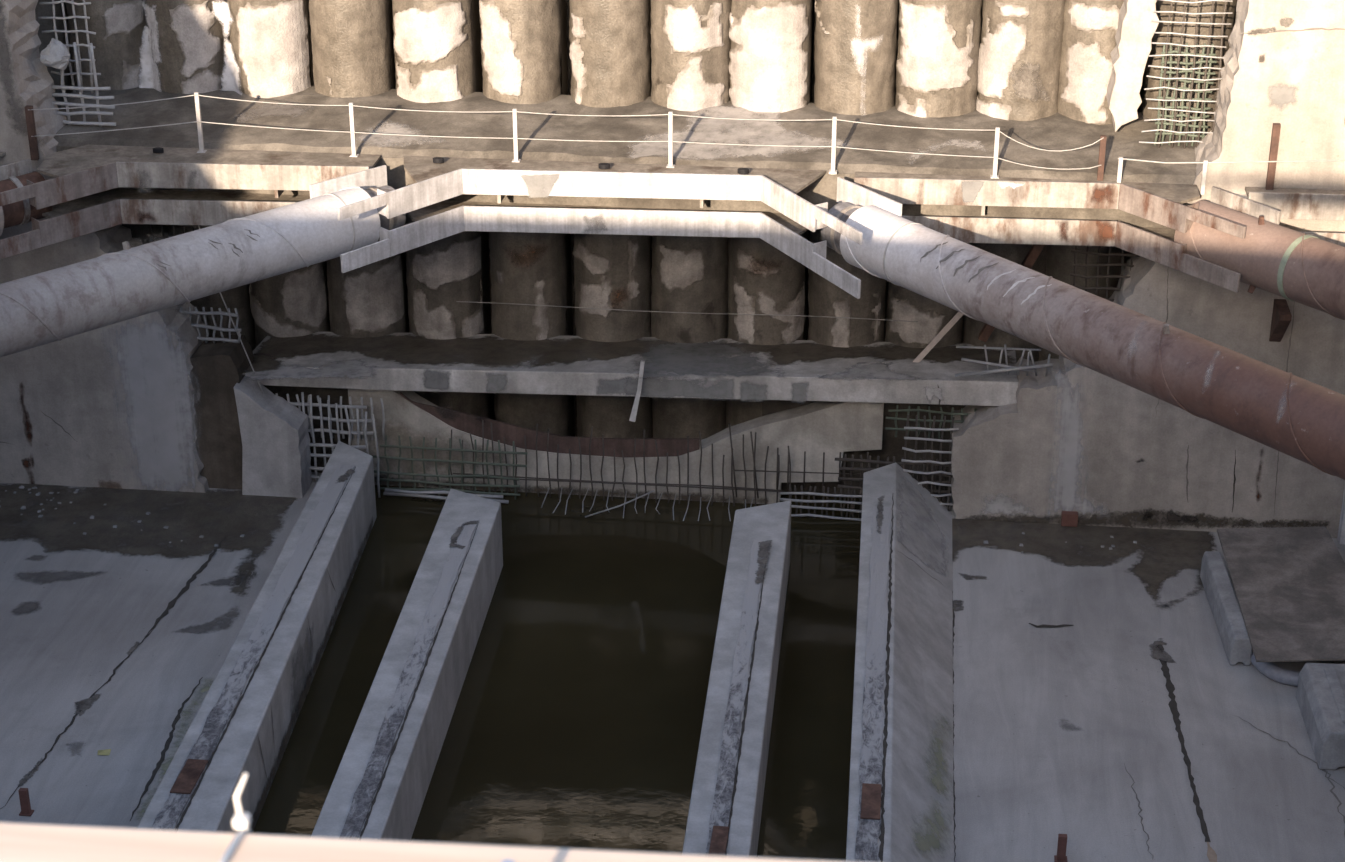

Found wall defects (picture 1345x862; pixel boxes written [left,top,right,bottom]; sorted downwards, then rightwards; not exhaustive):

peeling [38,0,144,127]
peeling [394,0,525,103]
peeling [569,13,587,104]
peeling [663,0,830,113]
spalling [1139,0,1233,149]
peeling [659,244,705,293]
spalling [276,392,977,534]
damp [12,602,38,614]
damp [18,555,101,584]
crack [0,536,227,821]
crack [1150,638,1217,862]
crack [1233,715,1345,836]